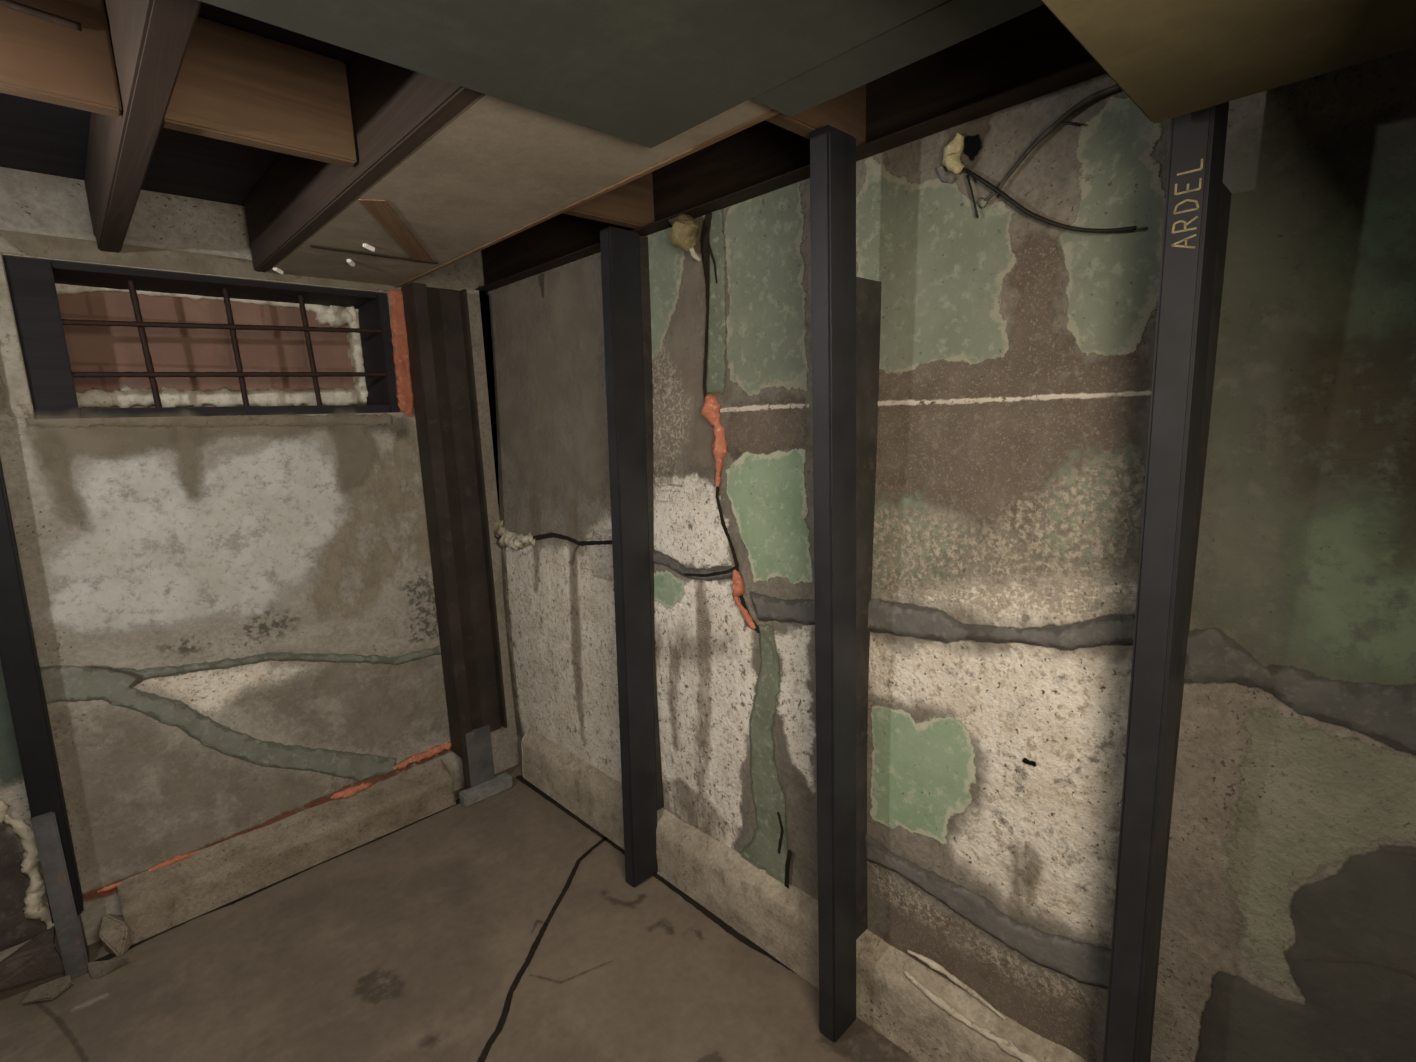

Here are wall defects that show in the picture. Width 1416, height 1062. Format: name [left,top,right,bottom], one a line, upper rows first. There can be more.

crack [701,212,717,401]
peeling [856,157,1017,375]
peeling [1058,96,1166,356]
damp [33,412,438,641]
crack [684,484,760,633]
peeling [726,448,813,584]
damp [62,714,336,866]
damp [142,659,447,747]
rust [147,742,452,872]
peeling [870,705,976,845]
rust [83,877,130,901]
crack [477,775,625,1062]